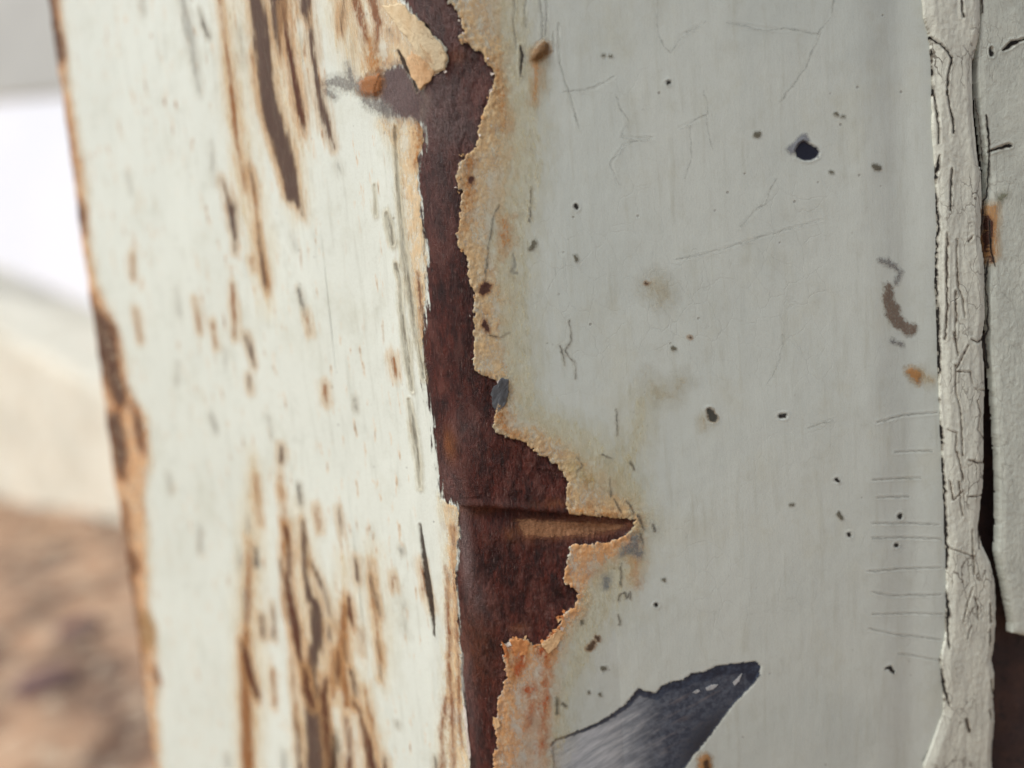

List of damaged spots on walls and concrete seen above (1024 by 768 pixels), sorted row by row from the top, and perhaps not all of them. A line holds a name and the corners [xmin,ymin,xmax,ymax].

corrosion [49,0,161,768]
corrosion [230,281,255,389]
corrosion [218,0,270,292]
corrosion [250,0,335,216]
corrosion [340,0,446,75]
corrosion [383,119,427,345]
peeling [374,0,636,768]
corrosion [450,0,641,768]
crack [928,36,1012,733]
corrosion [981,205,998,262]
corrosion [239,445,387,768]
corrosion [434,503,469,768]